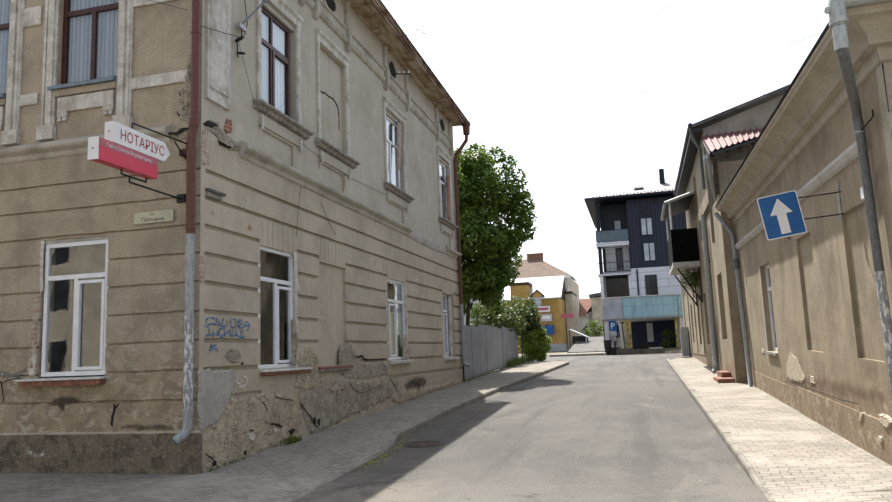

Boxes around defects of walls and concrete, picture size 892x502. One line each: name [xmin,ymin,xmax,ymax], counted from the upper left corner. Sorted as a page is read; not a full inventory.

flaking render [175,54,191,123]
flaking render [201,118,241,165]
flaking render [27,241,45,377]
flaking render [202,378,460,472]